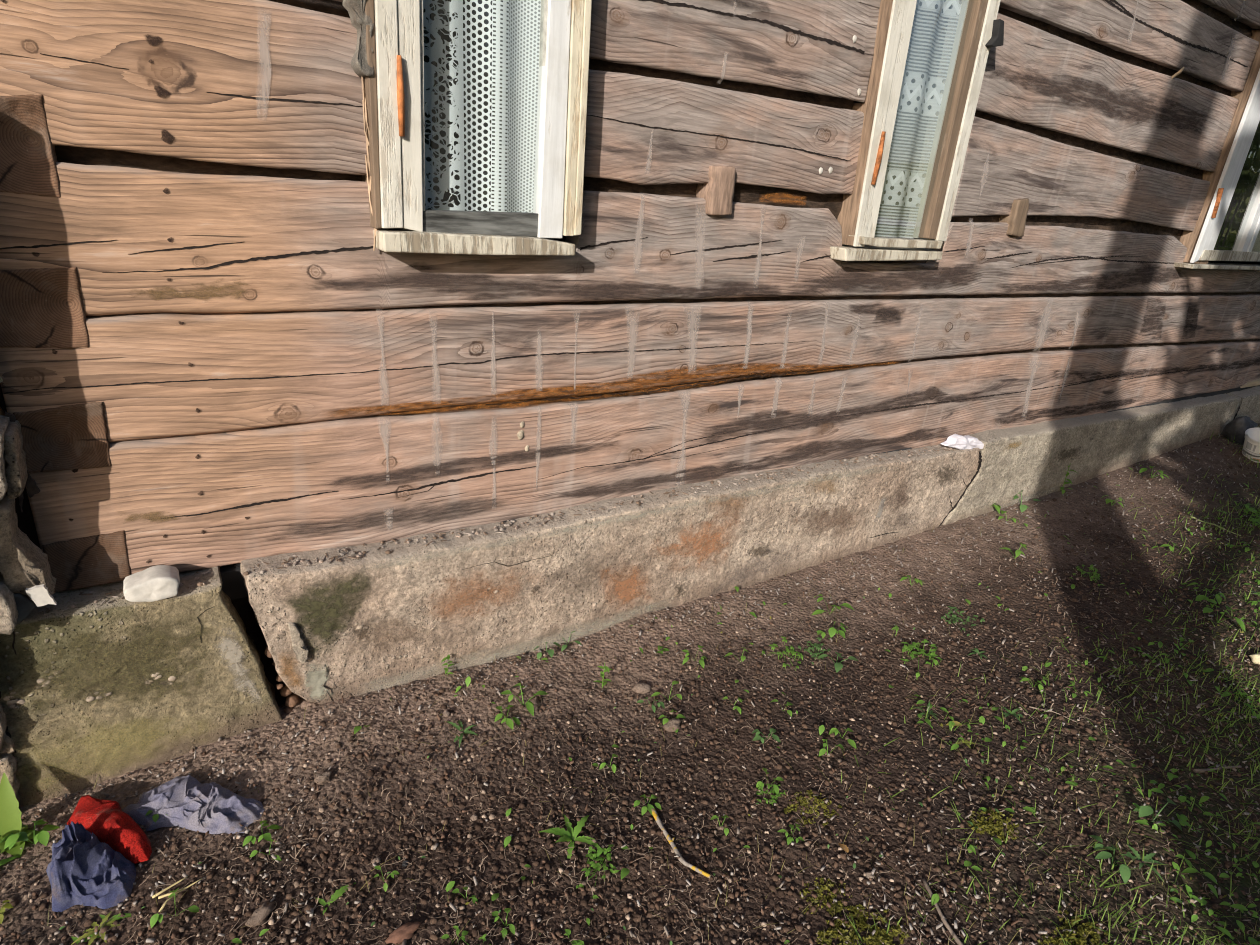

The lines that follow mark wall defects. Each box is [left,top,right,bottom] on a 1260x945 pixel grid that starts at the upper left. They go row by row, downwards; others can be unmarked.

crack [939,451,982,527]